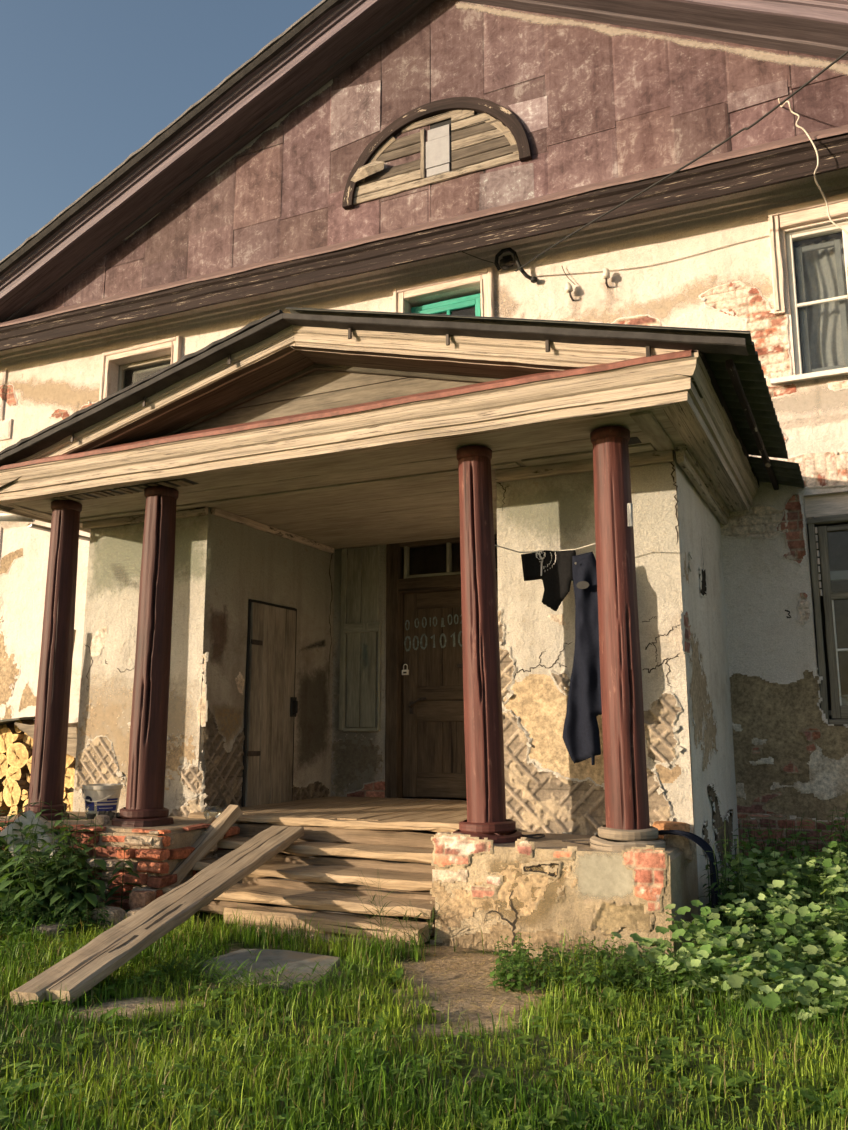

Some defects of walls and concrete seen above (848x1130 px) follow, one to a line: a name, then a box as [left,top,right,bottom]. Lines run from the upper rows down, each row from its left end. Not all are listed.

flaking render [590,314,662,326]
flaking render [698,280,798,399]
peeling [0,547,24,576]
flaking render [770,450,848,567]
peeling [0,590,37,720]
crack [515,642,572,675]
peeling [503,672,604,786]
crack [642,616,679,690]
peeling [654,609,718,795]
peeling [717,663,848,865]
crack [484,890,518,946]
peeling [430,818,696,955]